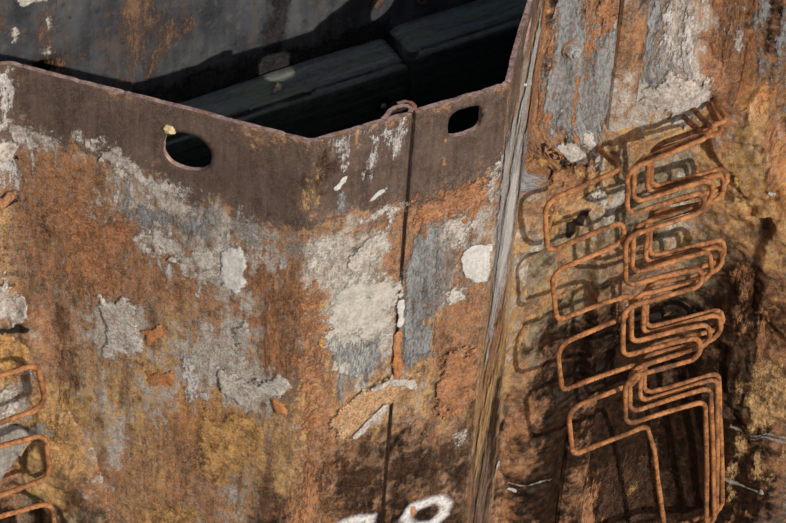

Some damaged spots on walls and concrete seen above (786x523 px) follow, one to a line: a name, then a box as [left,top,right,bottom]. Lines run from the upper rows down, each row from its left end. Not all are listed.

corrosion [521,0,590,191]
corrosion [571,0,617,149]
spalling [639,0,714,130]
corrosion [49,189,144,303]
peeling [220,246,247,295]
peeling [97,294,144,373]
corrosion [145,367,176,387]
peeling [216,366,292,406]
corrosion [242,251,335,523]
peeling [328,336,382,406]
spalling [0,422,53,488]
water stain [587,452,695,523]